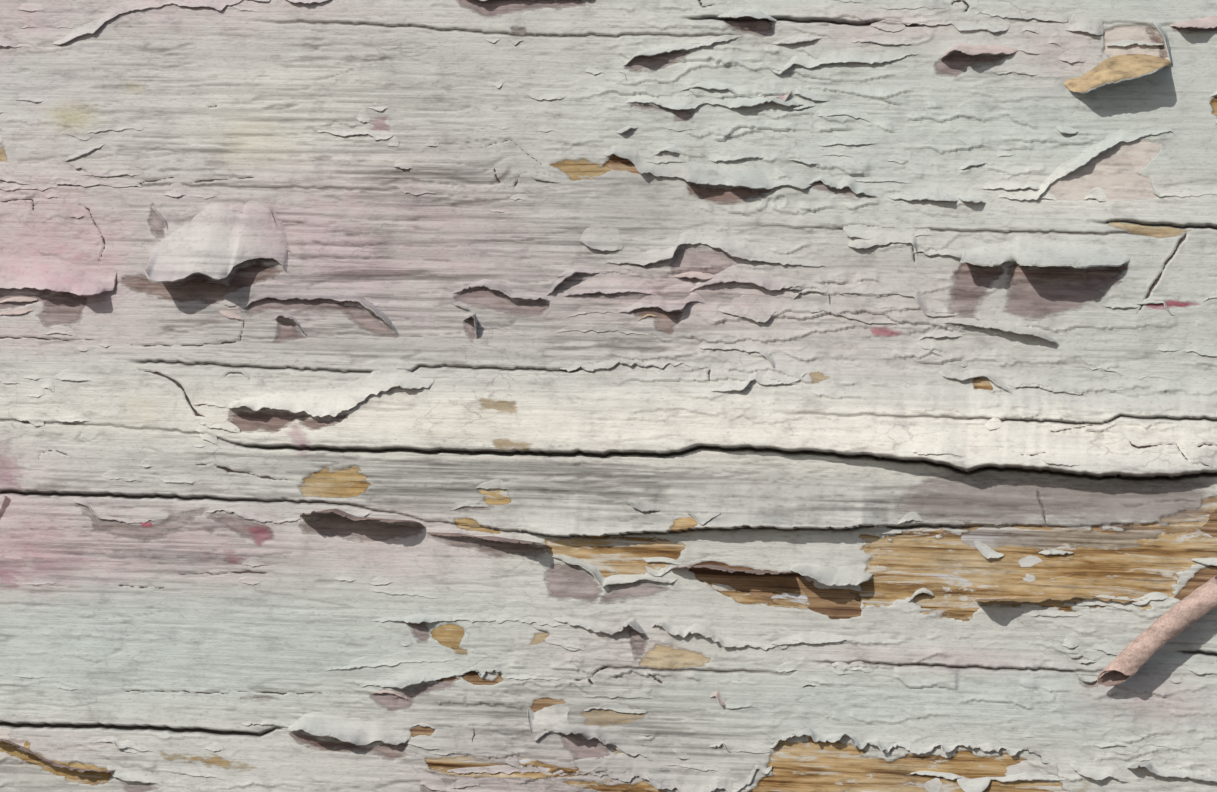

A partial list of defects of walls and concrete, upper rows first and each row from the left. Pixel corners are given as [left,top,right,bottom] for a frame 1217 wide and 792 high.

peeling [0,0,270,48]
peeling [459,0,583,16]
peeling [585,0,1217,205]
peeling [0,183,398,343]
peeling [452,218,1217,357]
peeling [191,368,434,432]
peeling [865,440,1204,534]
crack [1021,425,1093,456]
crack [1130,442,1217,466]
peeling [975,557,1217,687]
peeling [241,612,1217,792]
peeling [0,729,227,792]